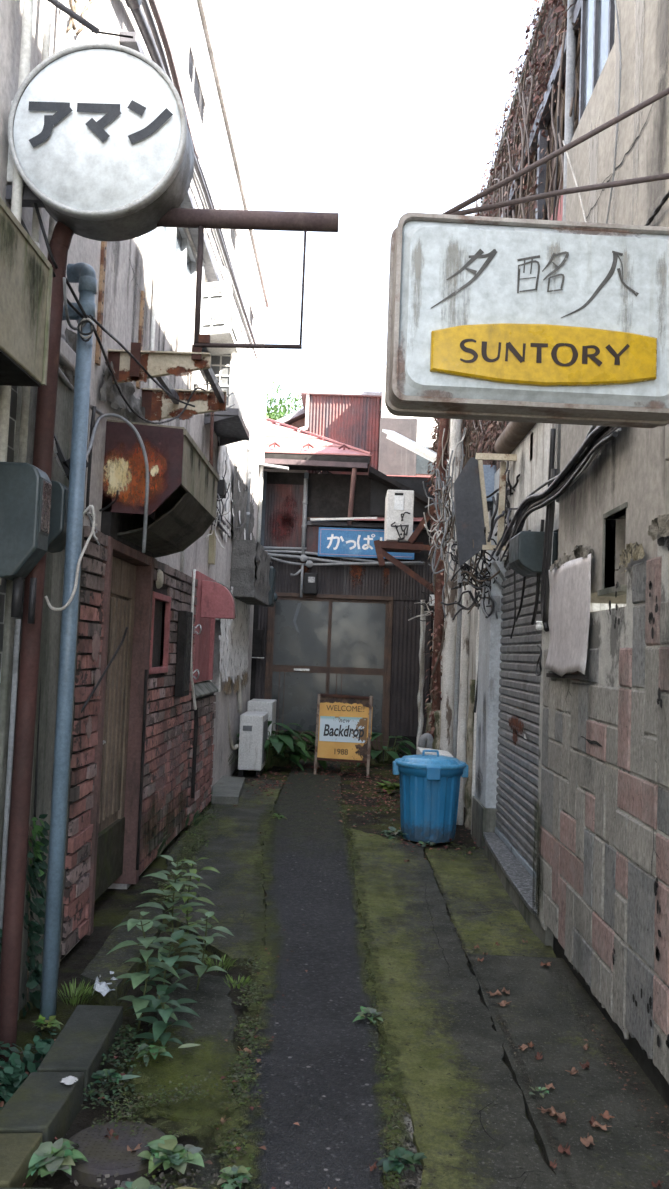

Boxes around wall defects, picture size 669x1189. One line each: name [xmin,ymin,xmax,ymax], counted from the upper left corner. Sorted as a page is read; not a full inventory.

corrosion [108,352,226,421]
corrosion [103,444,168,512]
flaking render [609,514,669,629]
peeling [219,585,250,684]